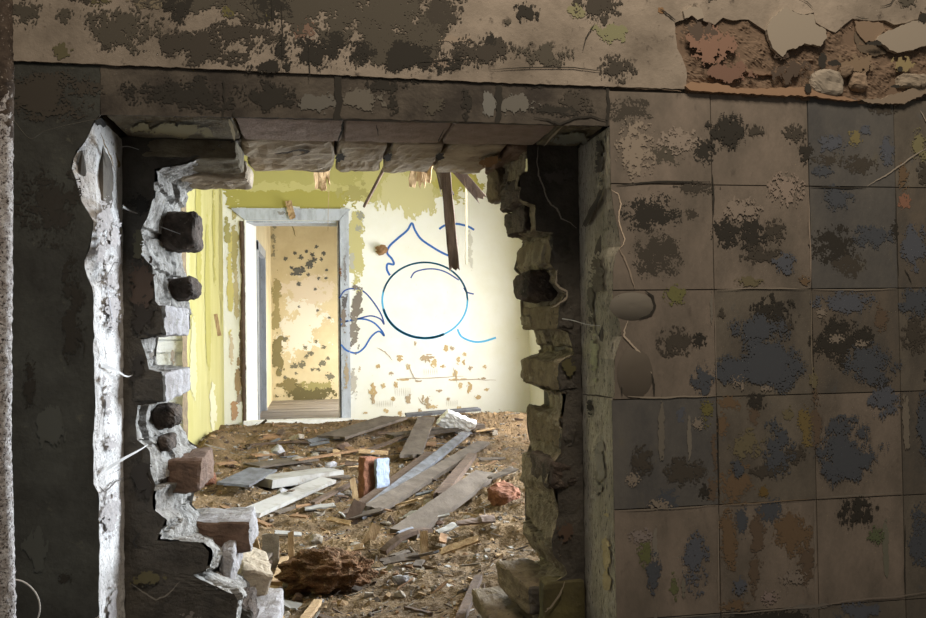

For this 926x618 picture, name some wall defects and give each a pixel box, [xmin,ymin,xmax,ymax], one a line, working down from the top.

water stain [55,0,596,121]
spalling [675,7,926,105]
spalling [142,138,254,190]
spalling [130,206,214,494]
mould [271,270,288,342]
mould [271,226,328,290]
water stain [279,340,335,381]
water stain [350,284,363,355]
spalling [486,167,575,331]
mould [619,180,721,281]
spalling [196,506,284,618]
spalling [472,558,585,618]